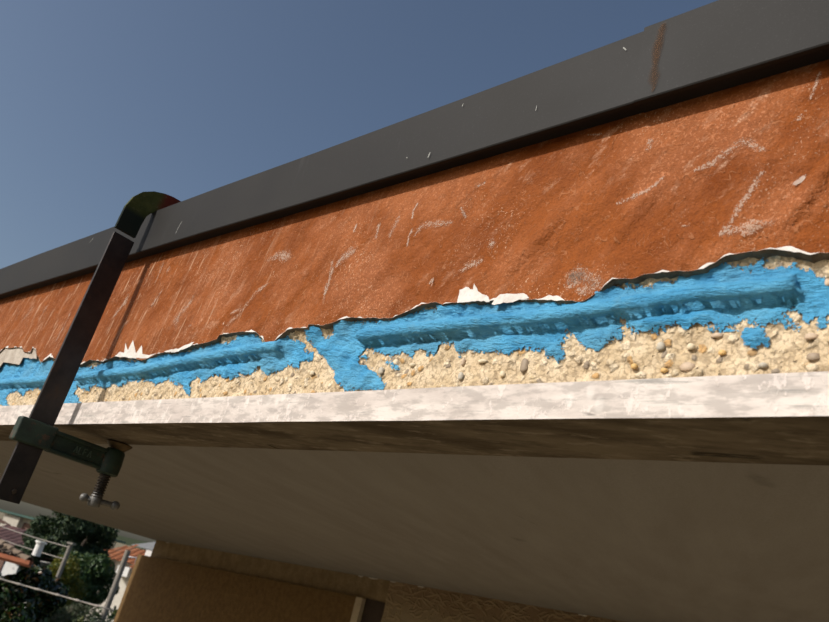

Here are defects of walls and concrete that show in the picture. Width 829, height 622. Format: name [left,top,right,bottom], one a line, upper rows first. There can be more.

spalling [0,346,55,406]
spalling [64,246,829,403]